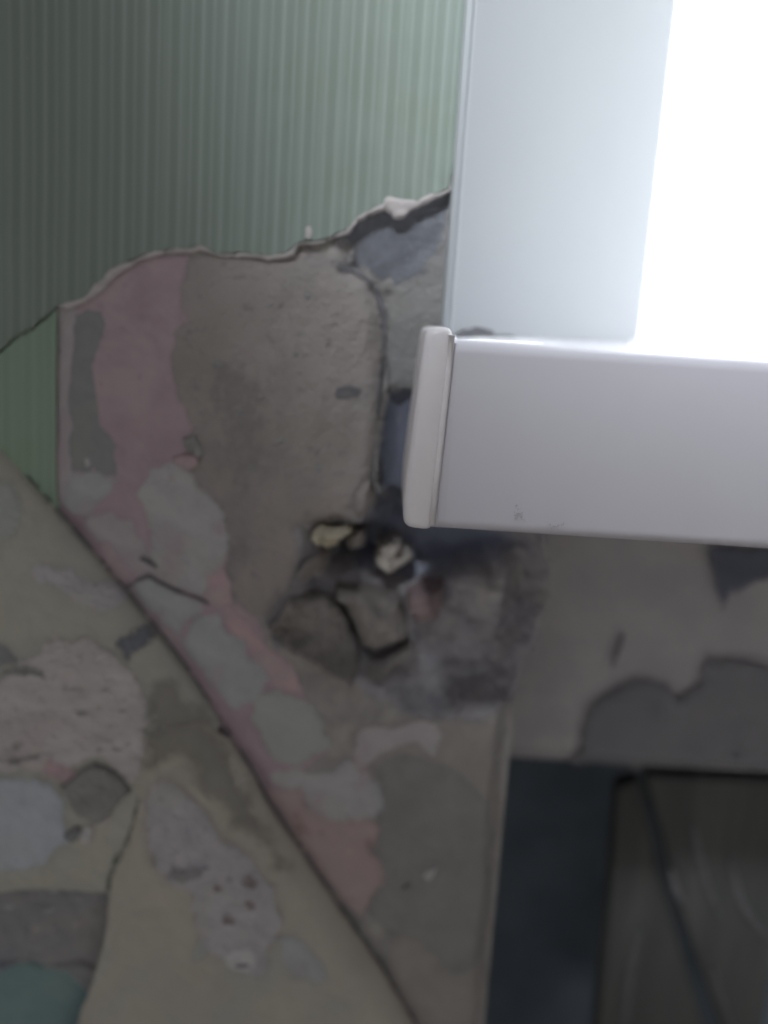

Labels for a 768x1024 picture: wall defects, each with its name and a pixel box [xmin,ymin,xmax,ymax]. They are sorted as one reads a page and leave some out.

peeling [57,307,78,506]
spalling [267,490,552,783]